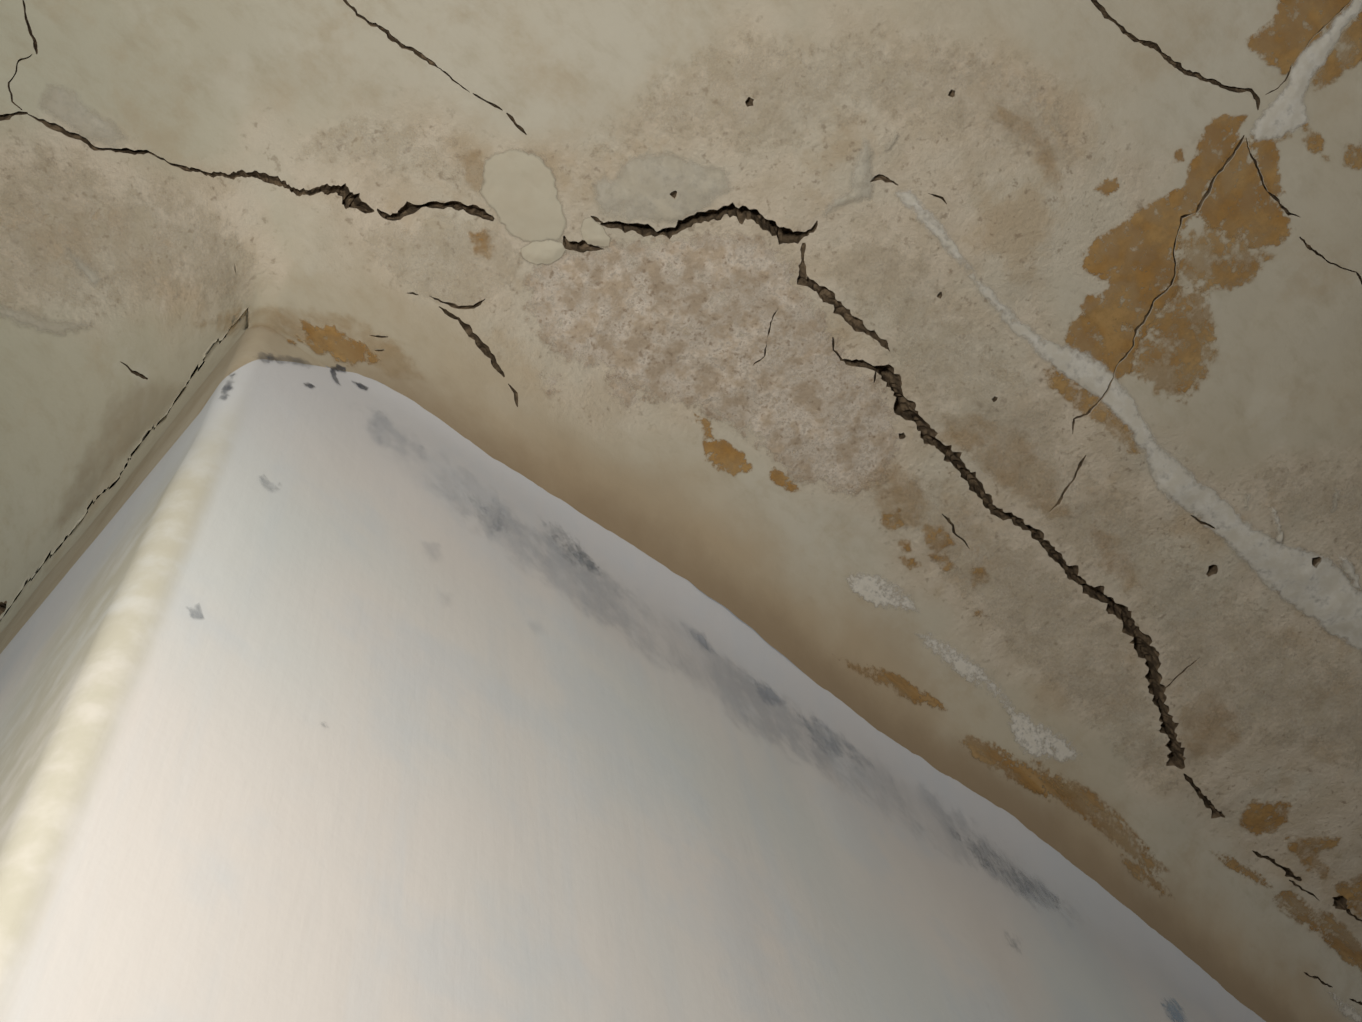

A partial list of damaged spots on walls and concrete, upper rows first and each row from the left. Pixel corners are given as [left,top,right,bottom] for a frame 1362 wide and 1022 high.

crack [0,0,495,221]
crack [343,0,527,135]
peeling [1248,0,1362,88]
peeling [288,320,378,364]
crack [408,292,518,407]
flaking render [480,149,899,494]
crack [563,0,1362,819]
peeling [1047,114,1291,453]
damp [919,633,1013,714]
peeling [963,736,1166,894]
peeling [1219,801,1362,971]
crack [1253,851,1362,921]